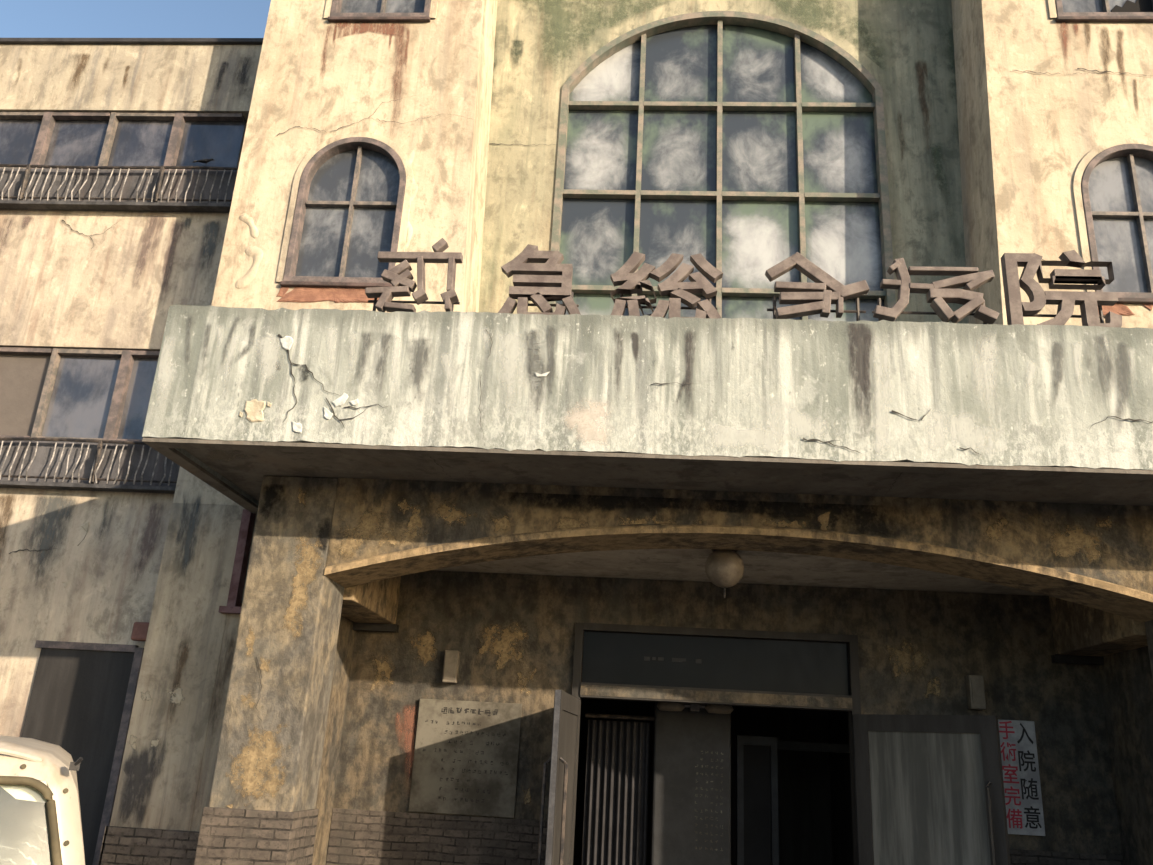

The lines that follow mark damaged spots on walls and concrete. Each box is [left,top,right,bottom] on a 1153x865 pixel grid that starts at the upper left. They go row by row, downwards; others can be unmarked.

leakage [72,54,90,86]
leakage [216,59,248,90]
corrosion [322,22,409,94]
leakage [511,40,522,63]
corrosion [1061,22,1078,56]
spalling [239,399,272,422]
crack [278,334,388,427]
leakage [483,328,555,401]
leakage [616,332,638,381]
leakage [679,333,695,396]
leakage [850,323,890,451]
leakage [29,496,75,575]